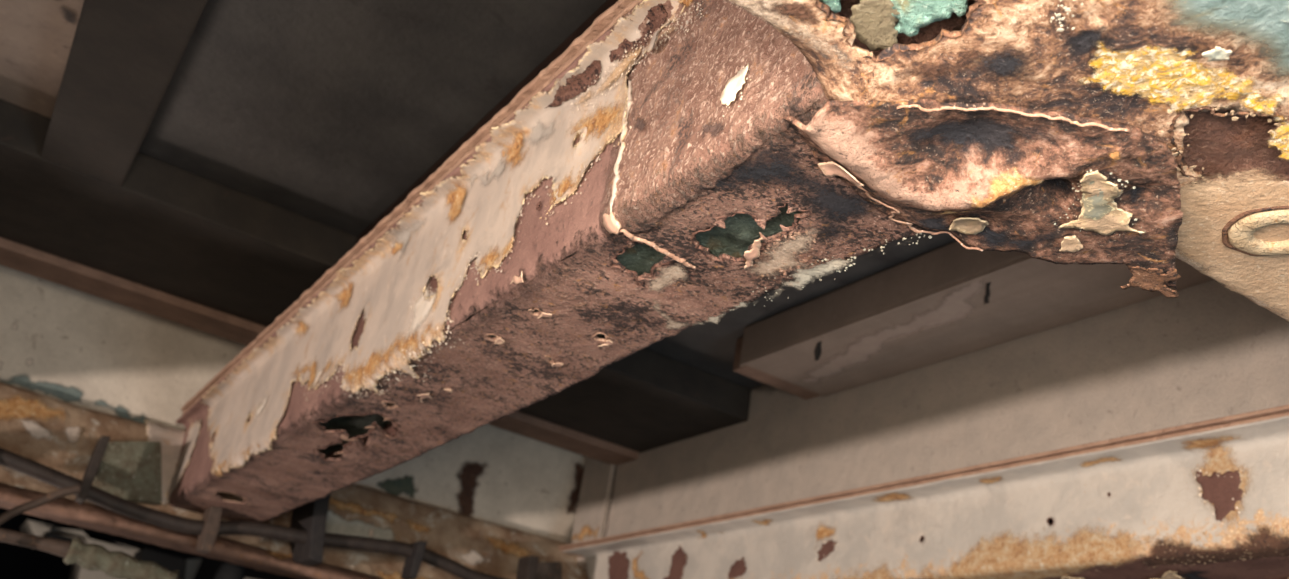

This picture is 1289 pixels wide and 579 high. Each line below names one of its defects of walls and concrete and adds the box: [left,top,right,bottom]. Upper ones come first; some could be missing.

rust [760,1,818,23]
rust [546,0,692,108]
rust [894,49,1031,78]
peeling [1202,46,1232,62]
rust [573,104,645,142]
rust [907,118,1071,231]
peeling [167,0,708,504]
peeling [744,202,801,270]
peeling [1054,170,1145,253]
rust [456,462,488,516]
peeling [1195,468,1245,524]
peeling [608,551,629,579]